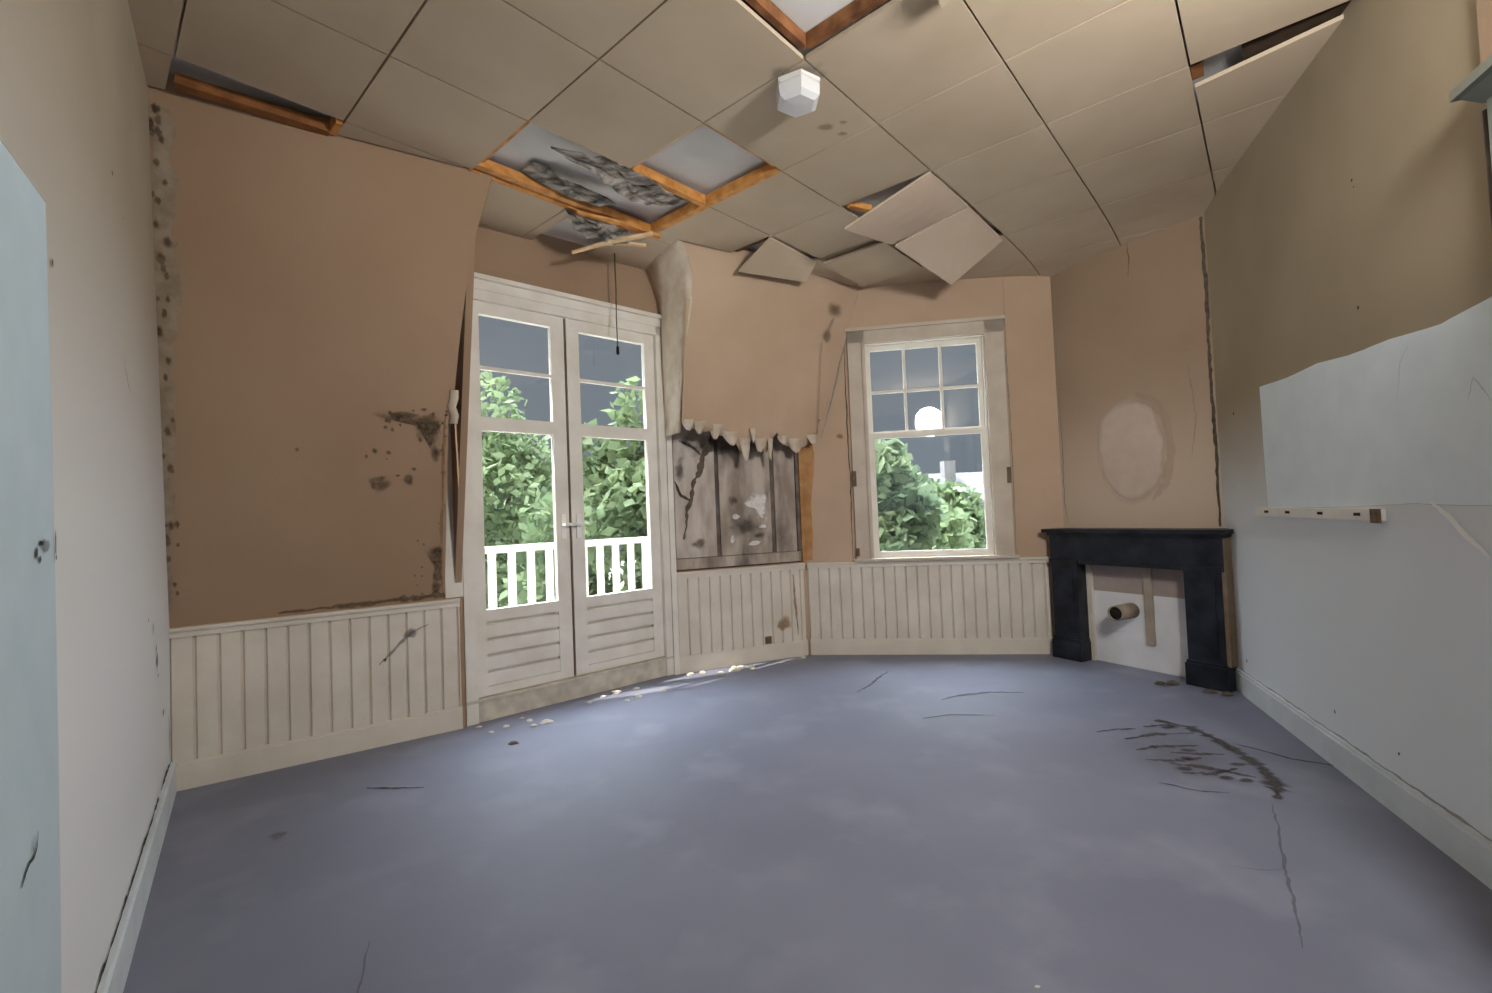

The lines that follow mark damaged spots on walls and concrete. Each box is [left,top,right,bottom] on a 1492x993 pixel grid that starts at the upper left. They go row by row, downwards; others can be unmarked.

water stain [371,468,416,488]
water stain [384,408,448,595]
crack [675,432,713,540]
water stain [1097,719,1287,800]